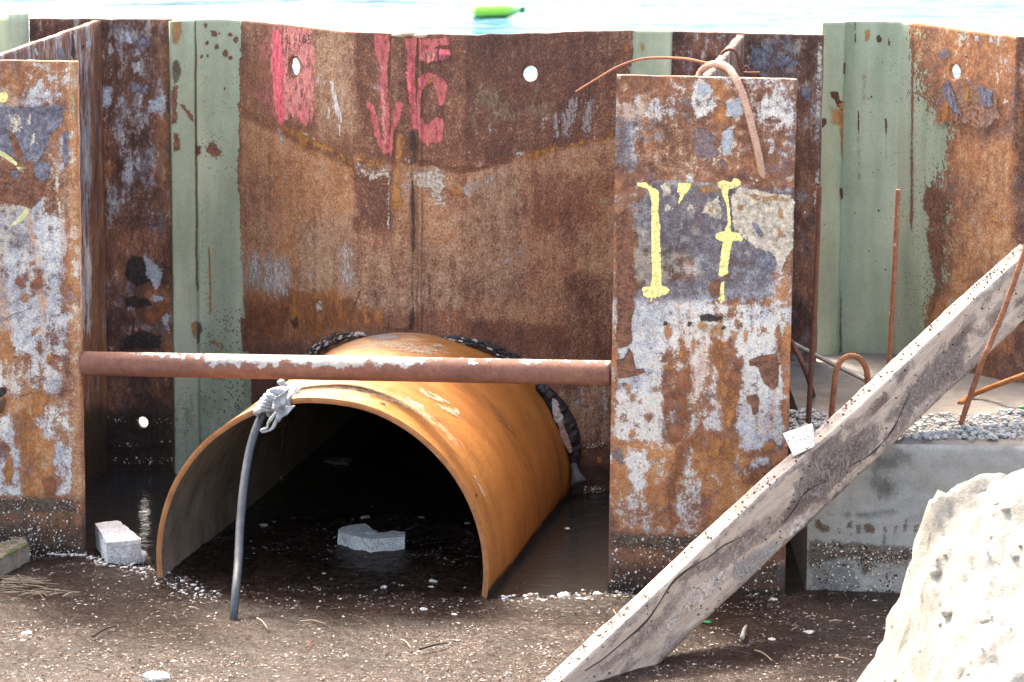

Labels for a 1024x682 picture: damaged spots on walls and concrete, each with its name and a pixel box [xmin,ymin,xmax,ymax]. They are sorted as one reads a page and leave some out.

peeling [0,47,75,216]
rust [0,168,47,215]
rust [744,174,769,189]
rust [900,34,949,327]
rust [15,277,43,303]
rust [125,285,167,350]
rust [191,285,384,352]
rust [615,208,645,404]
rust [708,273,731,296]
rust [0,387,62,498]
rust [645,313,782,529]